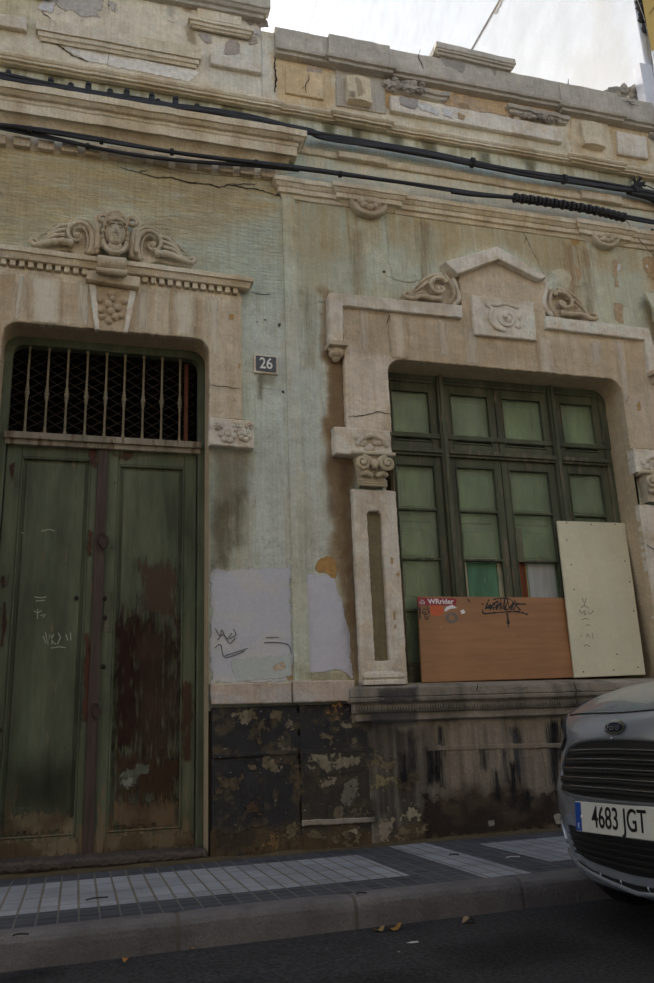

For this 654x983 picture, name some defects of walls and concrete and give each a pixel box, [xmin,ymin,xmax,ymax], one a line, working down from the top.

peeling [38,0,116,17]
flaking render [63,45,200,82]
crack [120,167,299,204]
water stain [209,445,261,563]
rust [109,558,183,804]
water stain [372,687,563,838]